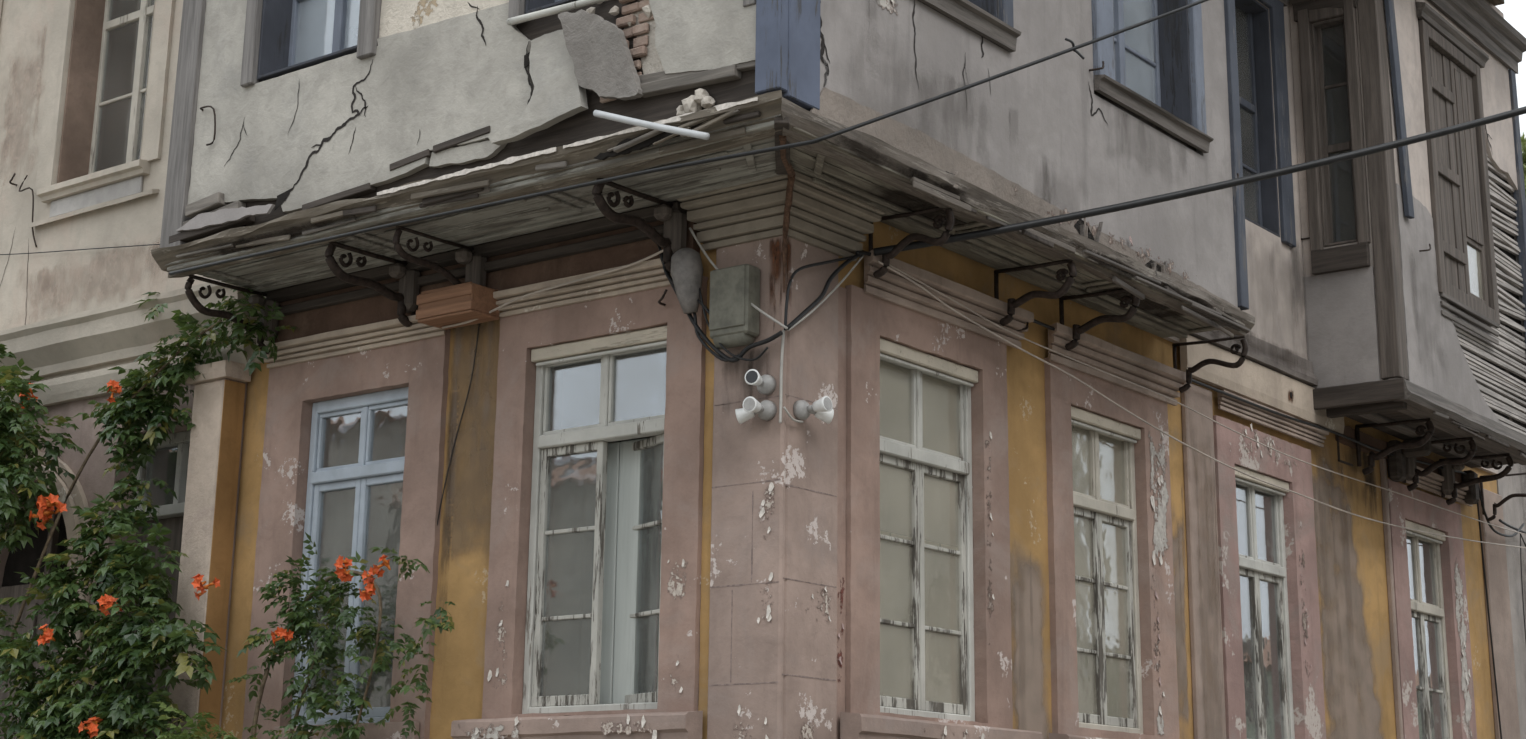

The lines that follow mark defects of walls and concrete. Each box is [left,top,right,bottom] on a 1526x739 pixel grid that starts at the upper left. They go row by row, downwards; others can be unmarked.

crack [274,60,373,211]
crack [468,2,486,45]
crack [524,41,533,105]
spalling [302,0,758,210]
crack [820,0,830,87]
crack [911,0,919,87]
peeling [759,482,775,543]
peeling [1148,432,1169,736]
leakage [1313,461,1383,739]
peeling [732,705,769,739]
peeling [799,722,815,739]